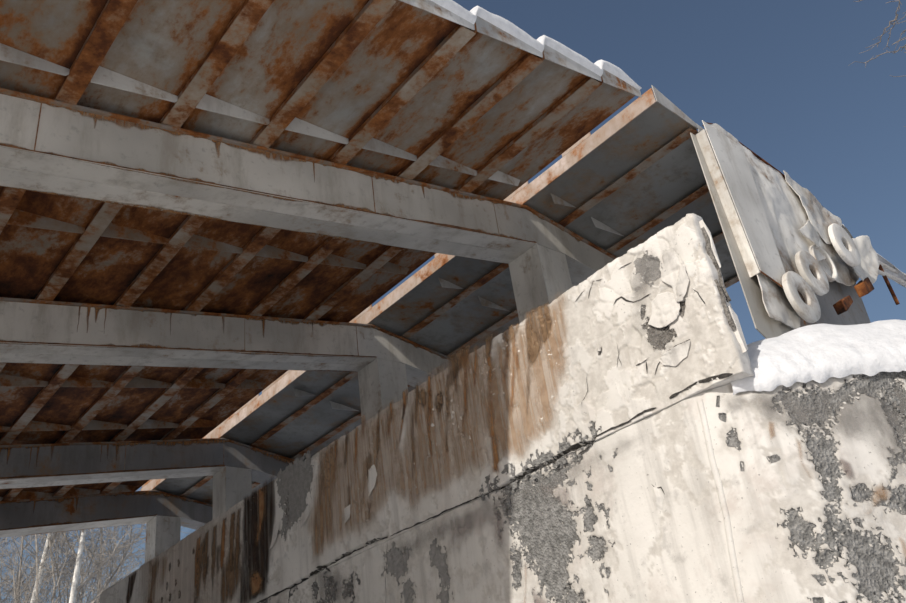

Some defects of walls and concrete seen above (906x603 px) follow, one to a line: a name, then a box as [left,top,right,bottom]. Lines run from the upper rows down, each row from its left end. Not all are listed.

rust [0,93,615,260]
crack [614,293,651,304]
crack [617,339,690,374]
peeling [633,248,706,350]
crack [701,227,736,331]
rust [194,479,275,603]
rust [0,301,564,554]
peeling [270,450,314,549]
crack [257,373,733,603]
spalling [479,421,615,603]
spalling [716,395,741,450]
spalling [772,370,906,603]